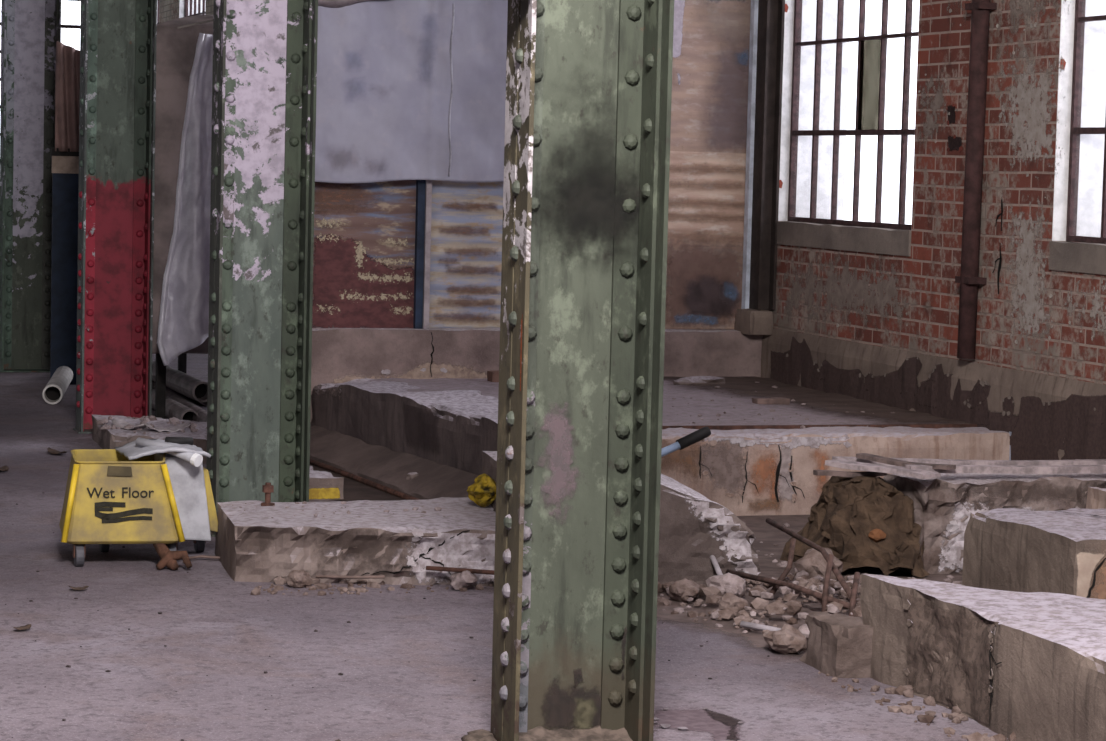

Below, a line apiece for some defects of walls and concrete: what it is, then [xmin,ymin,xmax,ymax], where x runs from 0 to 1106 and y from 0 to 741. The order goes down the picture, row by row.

spalling [406,528,495,584]
spalling [685,493,860,617]